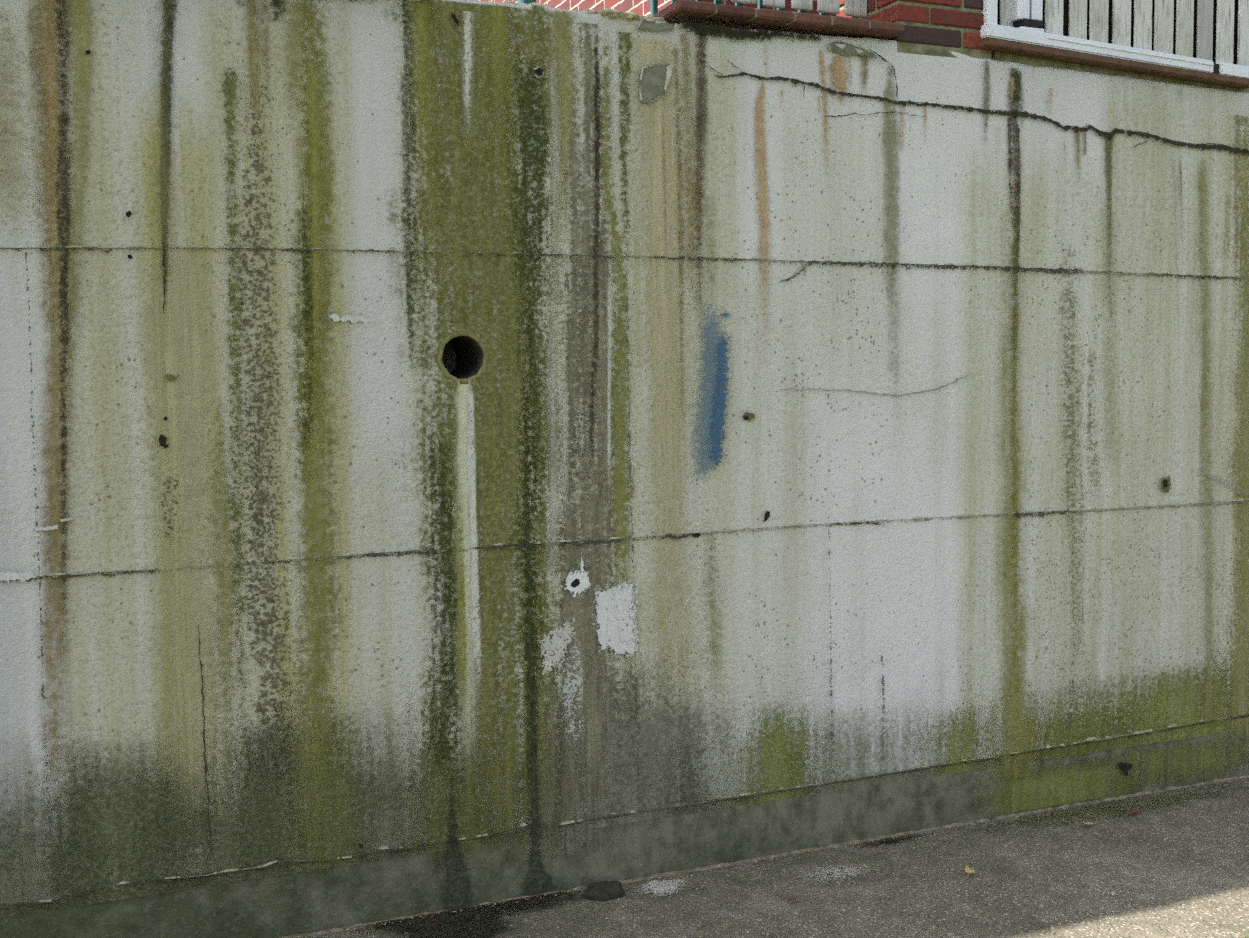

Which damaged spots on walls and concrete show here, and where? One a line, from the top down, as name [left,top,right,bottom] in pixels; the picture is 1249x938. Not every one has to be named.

spalling [638,62,674,104]
corrosion [755,82,770,301]
corrosion [818,50,868,143]
damp [884,65,904,332]
crack [708,50,1249,154]
damp [0,0,390,918]
damp [358,0,713,938]
damp [1002,68,1249,786]
crack [0,242,1247,934]
damp [749,709,812,804]
damp [936,712,989,774]
damp [807,866,867,881]